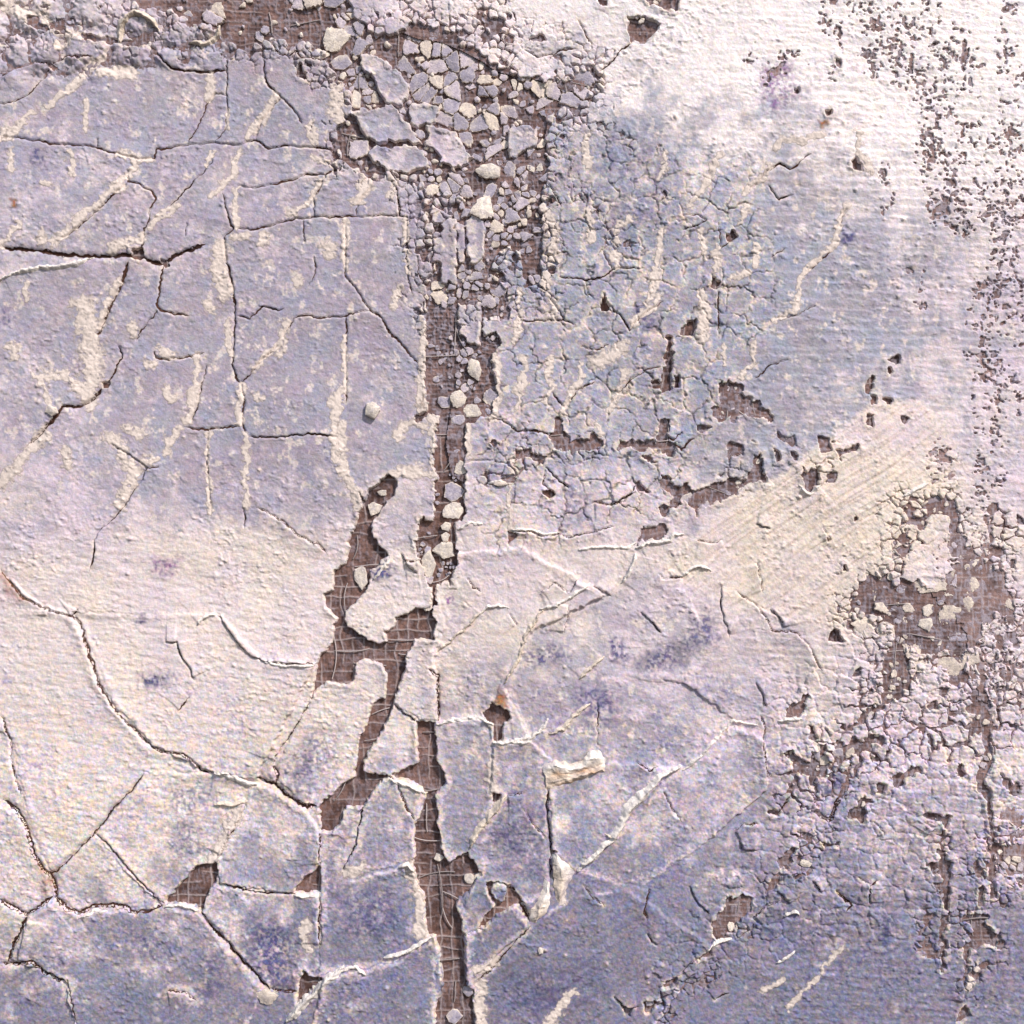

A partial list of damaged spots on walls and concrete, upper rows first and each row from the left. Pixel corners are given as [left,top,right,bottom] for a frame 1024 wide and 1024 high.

crack [4,44,418,475]
crack [522,251,663,351]
spalling [651,320,696,393]
spalling [0,0,636,1024]
peeling [616,419,675,463]
peeling [637,381,859,546]
peeling [757,0,1024,986]
crack [1,569,212,773]
crack [257,705,316,809]
crack [1,717,162,1024]
crack [201,912,296,993]
peeling [711,893,756,957]